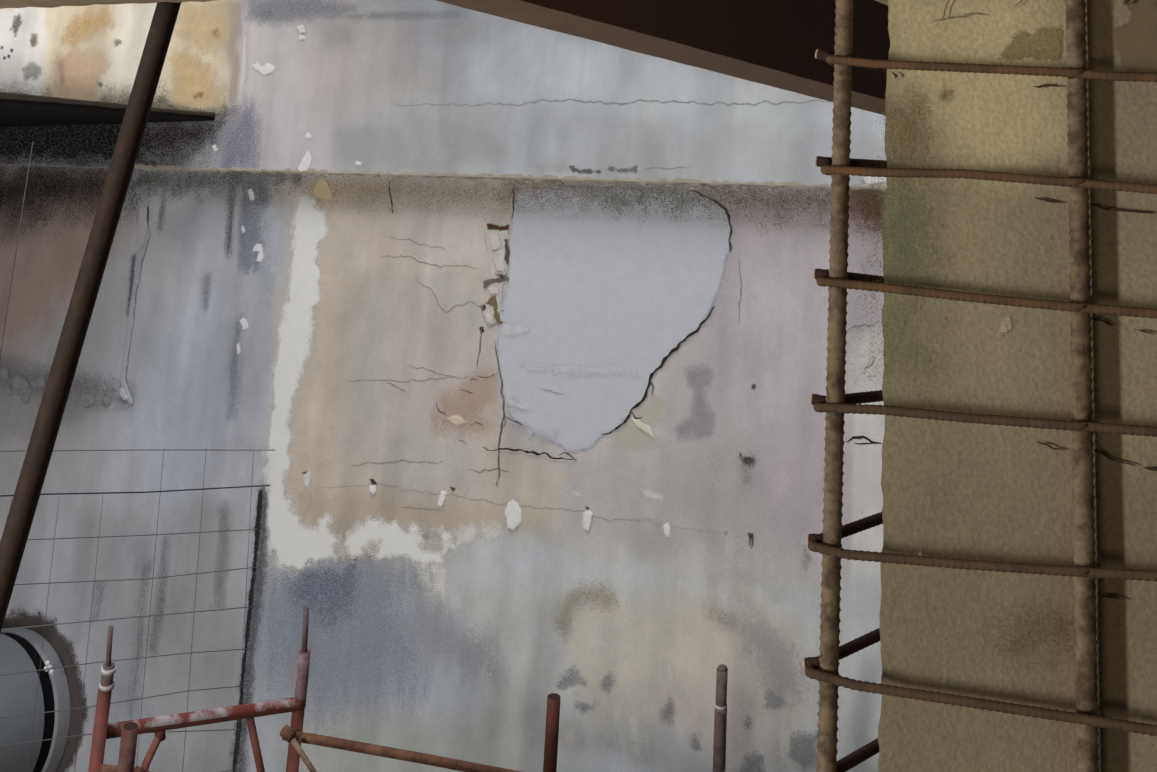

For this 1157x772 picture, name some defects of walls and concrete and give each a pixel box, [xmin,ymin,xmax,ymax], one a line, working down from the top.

crack [932,0,984,23]
crack [397,98,831,106]
spalling [480,223,510,329]
crack [311,167,742,537]
water stain [671,361,717,444]
water stain [237,553,510,734]
water stain [701,522,819,772]
water stain [555,665,677,767]